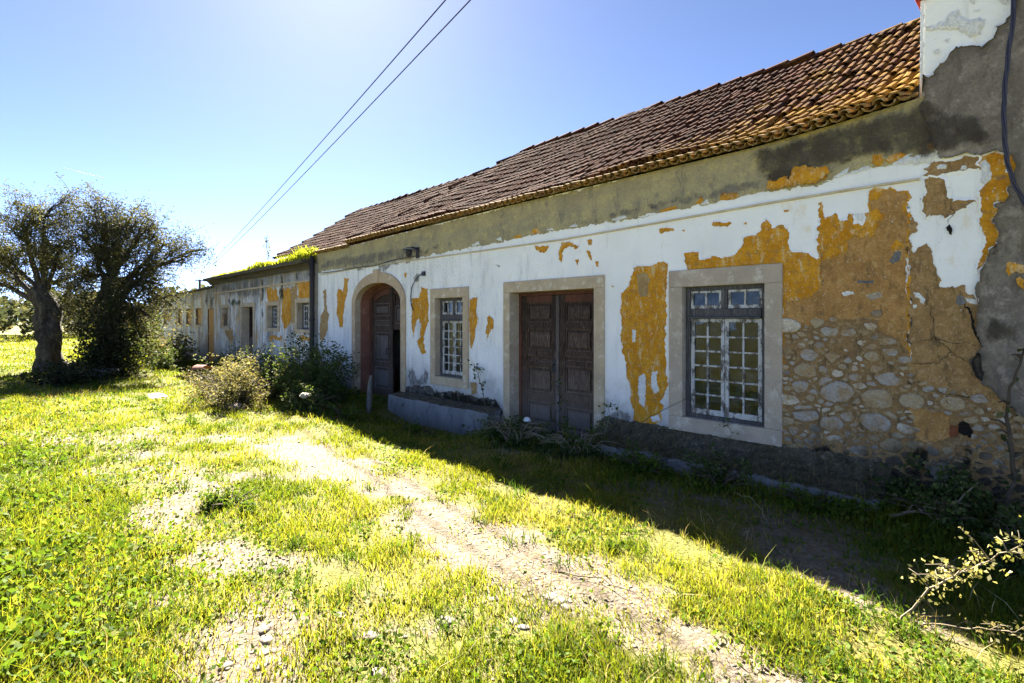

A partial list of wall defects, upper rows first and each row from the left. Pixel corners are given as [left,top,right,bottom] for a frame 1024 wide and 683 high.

water stain [758,102,988,181]
flaking render [300,0,1024,509]
peeling [266,282,309,341]
crack [914,296,982,364]